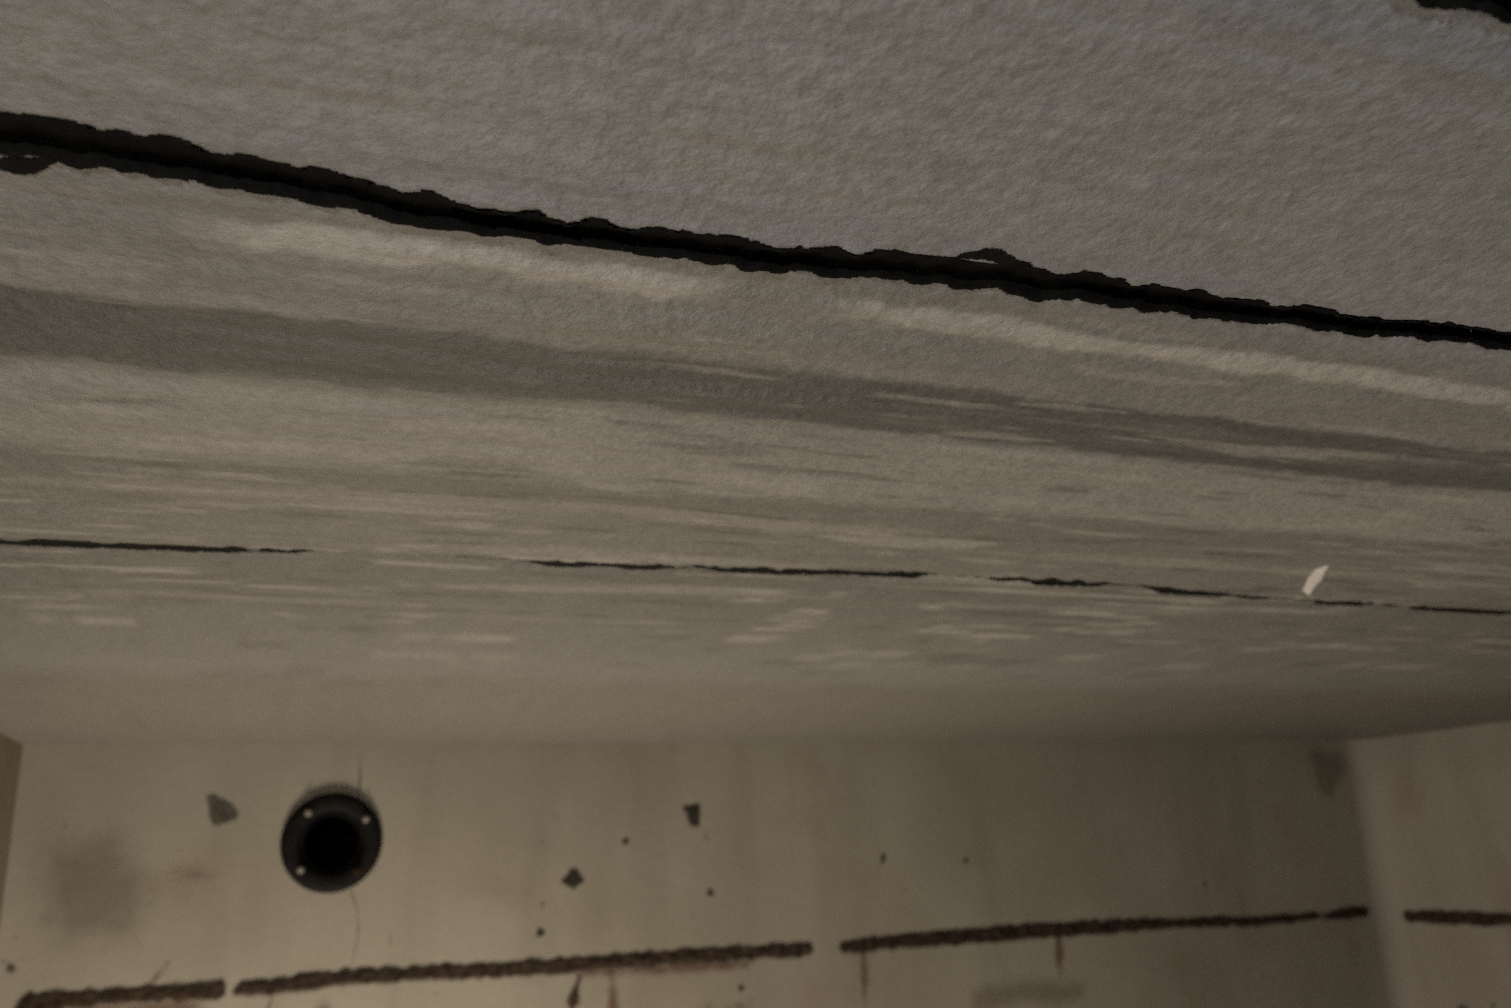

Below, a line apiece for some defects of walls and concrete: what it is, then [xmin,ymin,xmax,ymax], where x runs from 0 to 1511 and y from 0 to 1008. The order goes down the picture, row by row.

crack [1415,0,1511,25]
crack [0,112,1511,351]